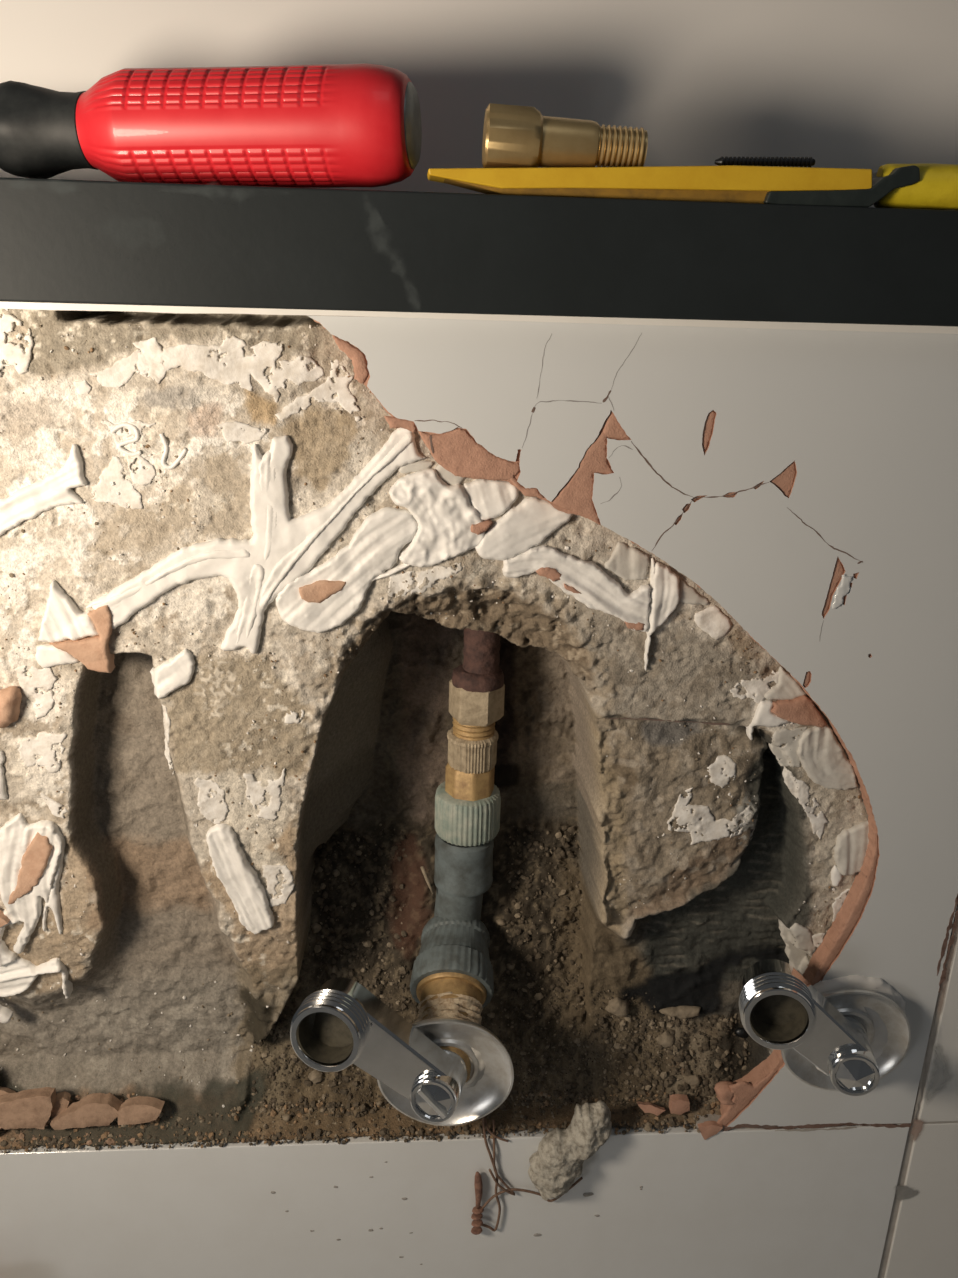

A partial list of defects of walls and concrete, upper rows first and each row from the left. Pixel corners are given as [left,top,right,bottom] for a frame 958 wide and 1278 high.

flaking render [73,335,368,422]
crack [522,333,642,447]
spalling [384,411,630,526]
crack [601,441,768,550]
crack [789,509,863,564]
peeling [299,580,346,603]
peeling [49,605,115,673]
peeling [730,671,828,840]
flaking render [667,787,754,845]
peeling [8,832,53,904]
flaking render [262,865,295,907]
spalling [778,830,879,978]